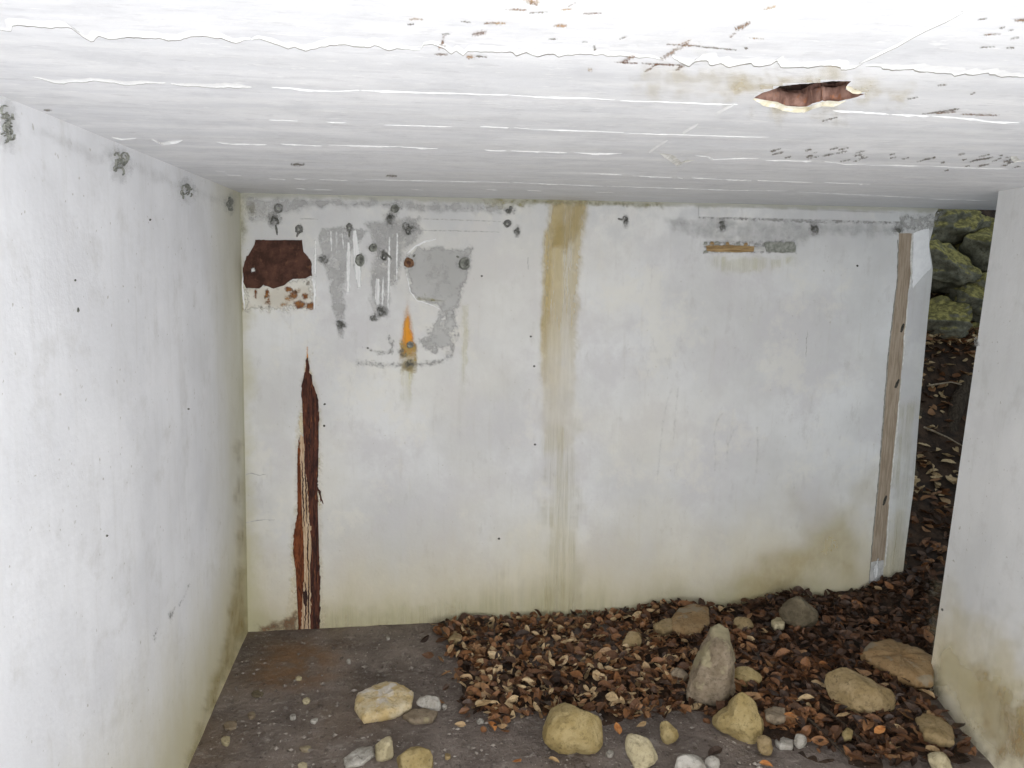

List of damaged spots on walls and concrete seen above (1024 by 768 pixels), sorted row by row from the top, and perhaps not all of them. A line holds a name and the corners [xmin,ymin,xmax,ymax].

peeling [0,11,1024,124]
peeling [700,148,865,165]
peeling [890,154,1019,171]
peeling [245,178,497,365]
damp [547,203,585,305]
corrosion [401,316,416,370]